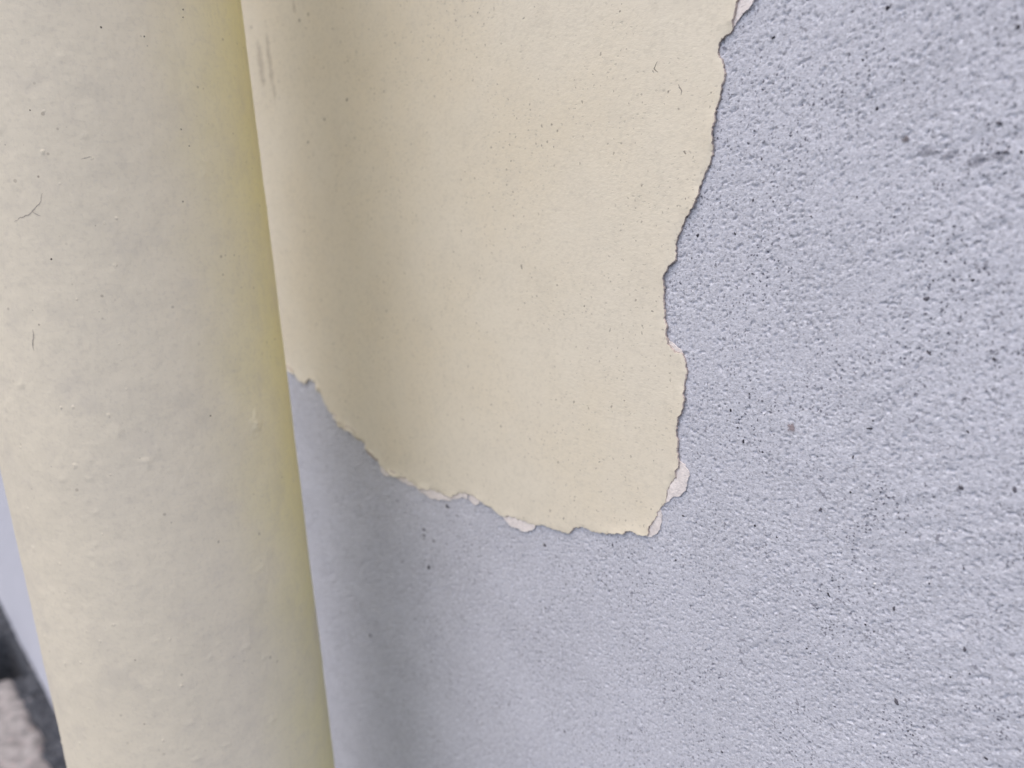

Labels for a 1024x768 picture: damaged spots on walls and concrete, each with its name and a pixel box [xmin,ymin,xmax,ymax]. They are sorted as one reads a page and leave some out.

peeling [0,471,53,706]
peeling [286,0,1024,768]